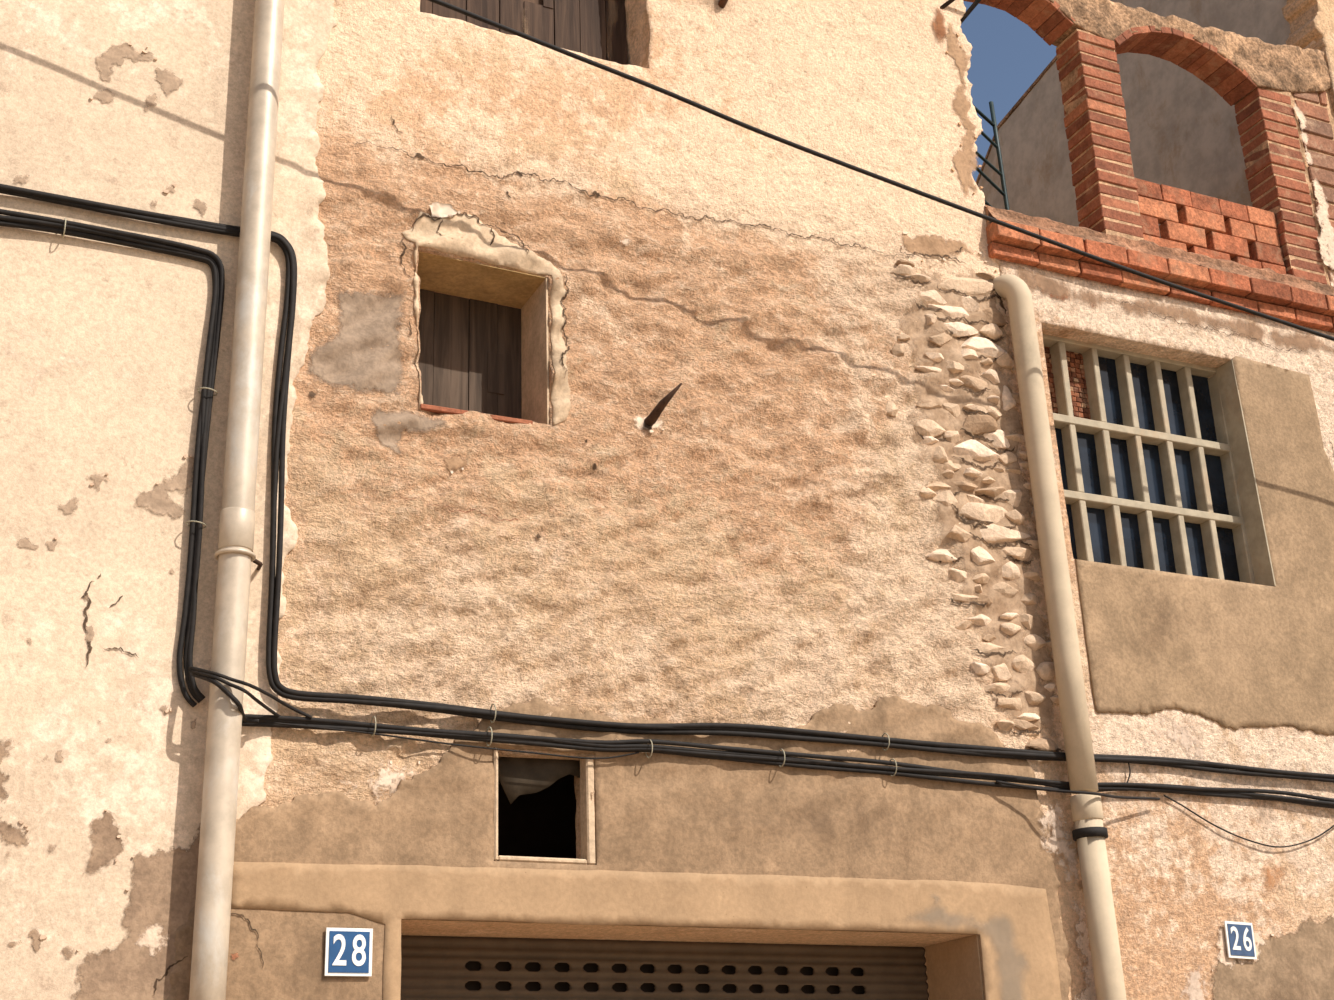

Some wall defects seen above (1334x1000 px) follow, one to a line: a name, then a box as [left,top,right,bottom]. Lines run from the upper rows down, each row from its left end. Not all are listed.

peeling [90,43,183,111]
flaking render [945,9,983,195]
water stain [1293,102,1313,164]
crack [348,117,1007,314]
water stain [1313,180,1334,287]
crack [559,270,570,378]
flaking render [901,232,1058,737]
crack [81,573,139,667]
peeling [0,741,11,800]
peeling [0,817,29,855]
peeling [63,809,201,1000]
flaking render [1211,915,1334,1000]